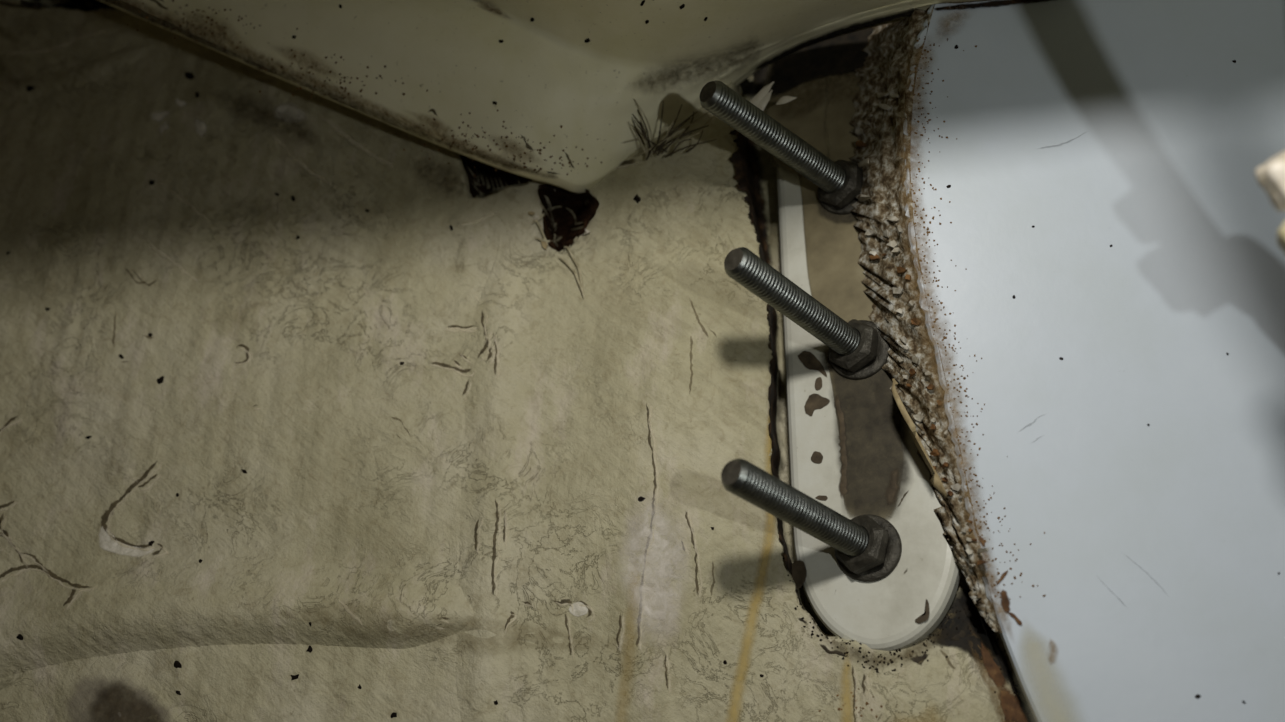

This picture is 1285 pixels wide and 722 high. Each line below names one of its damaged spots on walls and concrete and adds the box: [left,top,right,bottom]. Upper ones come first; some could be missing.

peeling [749,63,860,162]
peeling [772,155,874,323]
corrosion [905,16,1046,625]
peeling [798,348,948,519]
damp [71,686,163,722]
corrosion [980,642,1028,722]